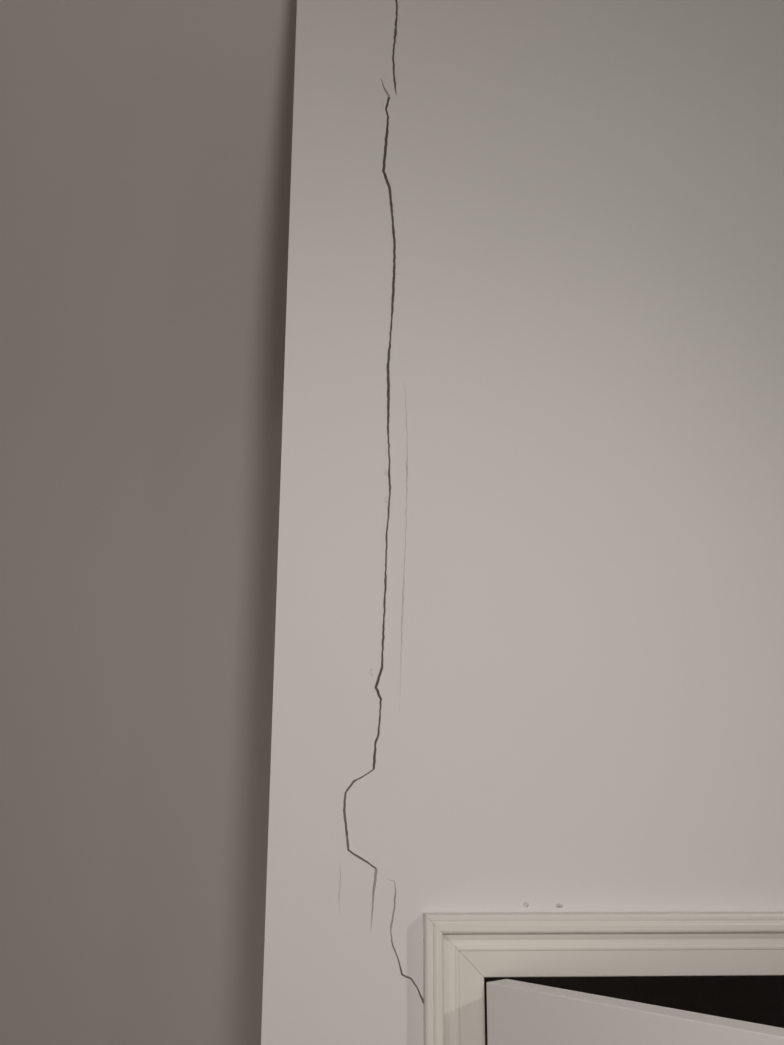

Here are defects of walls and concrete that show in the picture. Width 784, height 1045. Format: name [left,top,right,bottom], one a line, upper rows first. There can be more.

crack [339,0,424,1004]